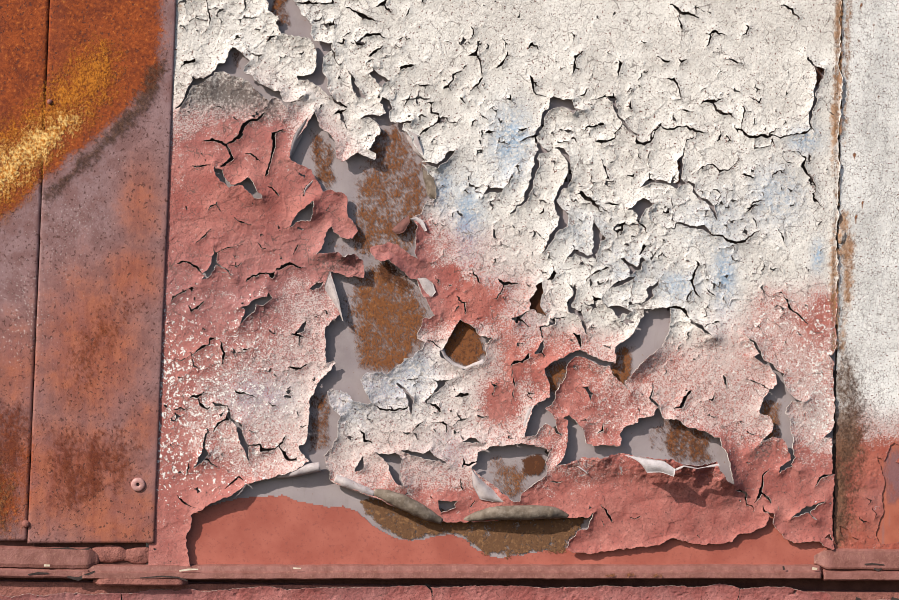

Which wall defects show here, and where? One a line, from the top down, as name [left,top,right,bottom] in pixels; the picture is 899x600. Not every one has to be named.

corrosion [0,39,122,219]
crack [194,113,284,196]
peeling [175,47,304,109]
peeling [267,0,332,96]
peeling [807,57,825,130]
crack [167,202,324,364]
crack [187,390,306,489]
corrosion [328,125,429,372]
peeling [186,68,830,574]
crack [296,0,843,545]
corrosion [830,233,870,542]
corrosion [360,497,588,560]